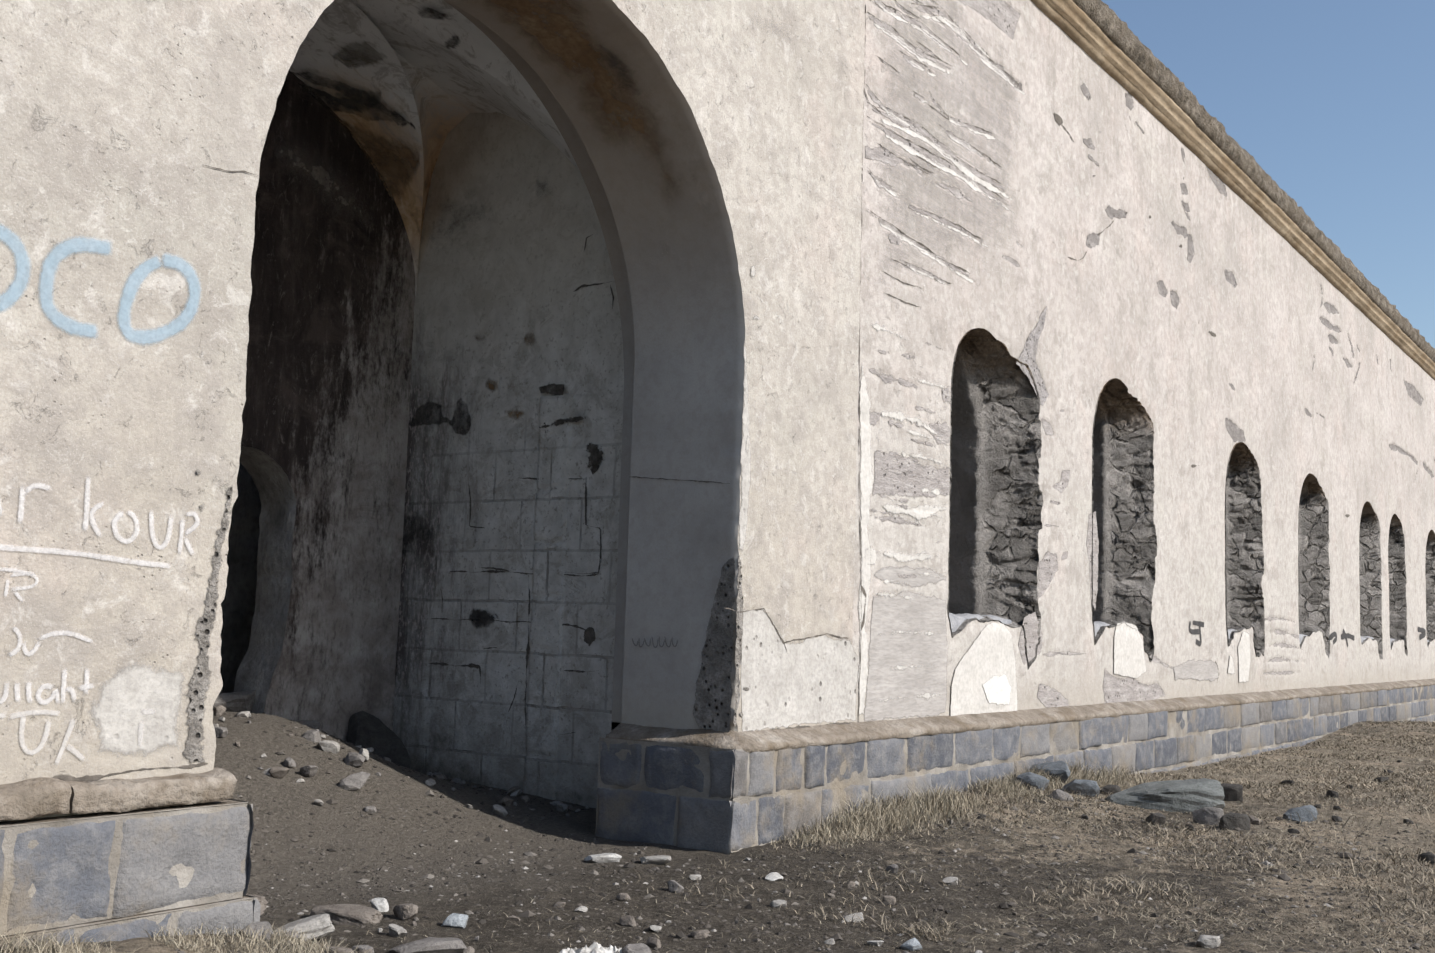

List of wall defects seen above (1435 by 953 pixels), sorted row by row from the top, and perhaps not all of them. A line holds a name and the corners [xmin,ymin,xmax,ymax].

water stain [419,8,447,20]
water stain [292,72,415,129]
flaking render [865,0,1029,247]
flaking render [866,208,973,307]
flaking render [1068,205,1127,261]
flaking render [1157,280,1179,309]
flaking render [1171,178,1195,263]
flaking render [869,350,917,388]
flaking render [869,386,951,526]
crack [726,328,867,730]
flaking render [91,487,233,764]
flaking render [693,541,948,733]